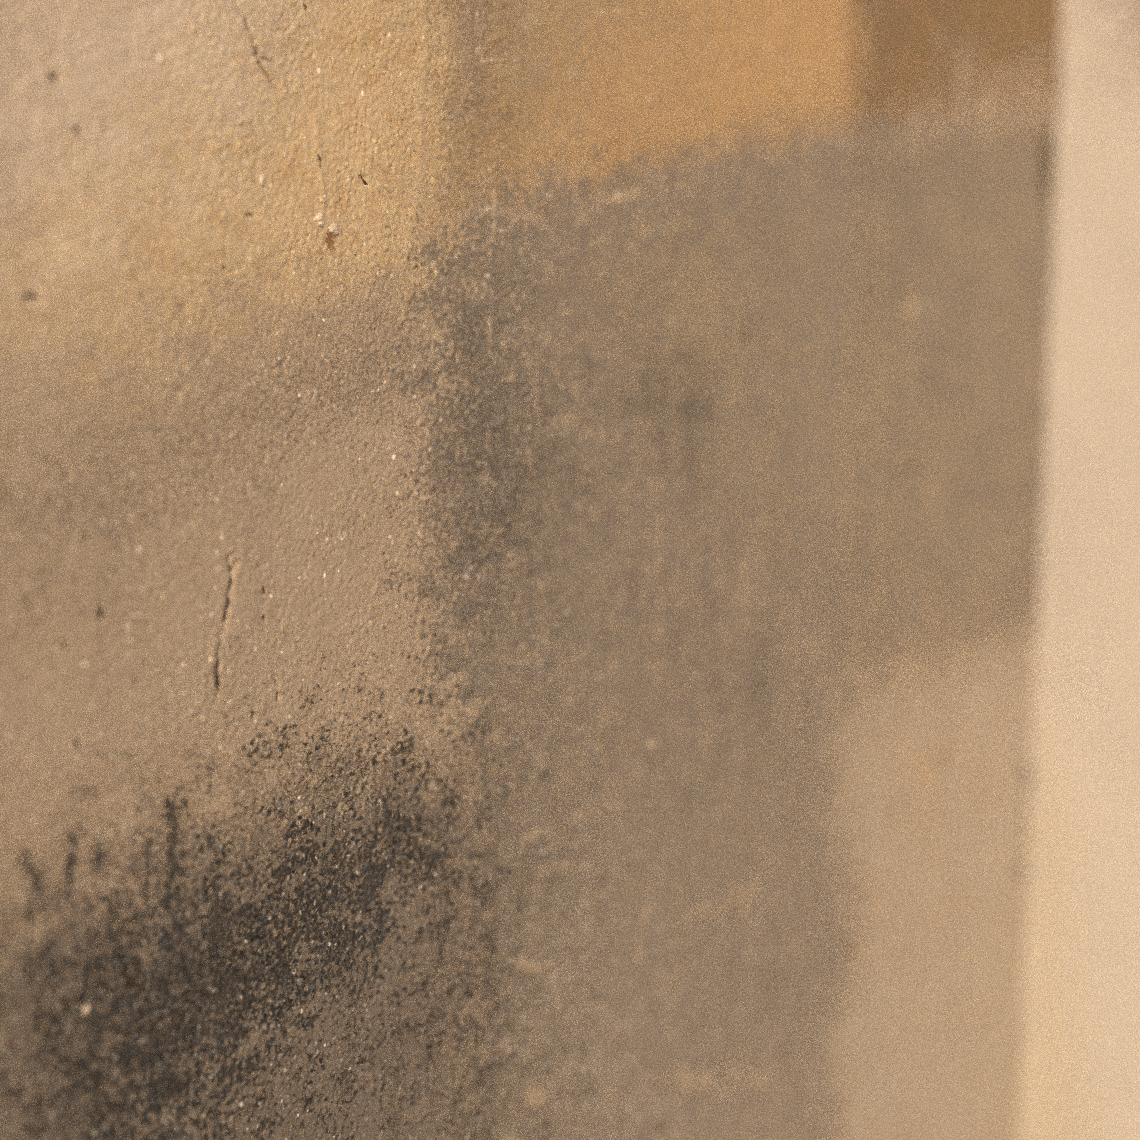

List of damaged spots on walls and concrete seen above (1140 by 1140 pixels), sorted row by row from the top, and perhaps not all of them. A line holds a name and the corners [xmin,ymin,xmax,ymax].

crack [215,559,235,695]